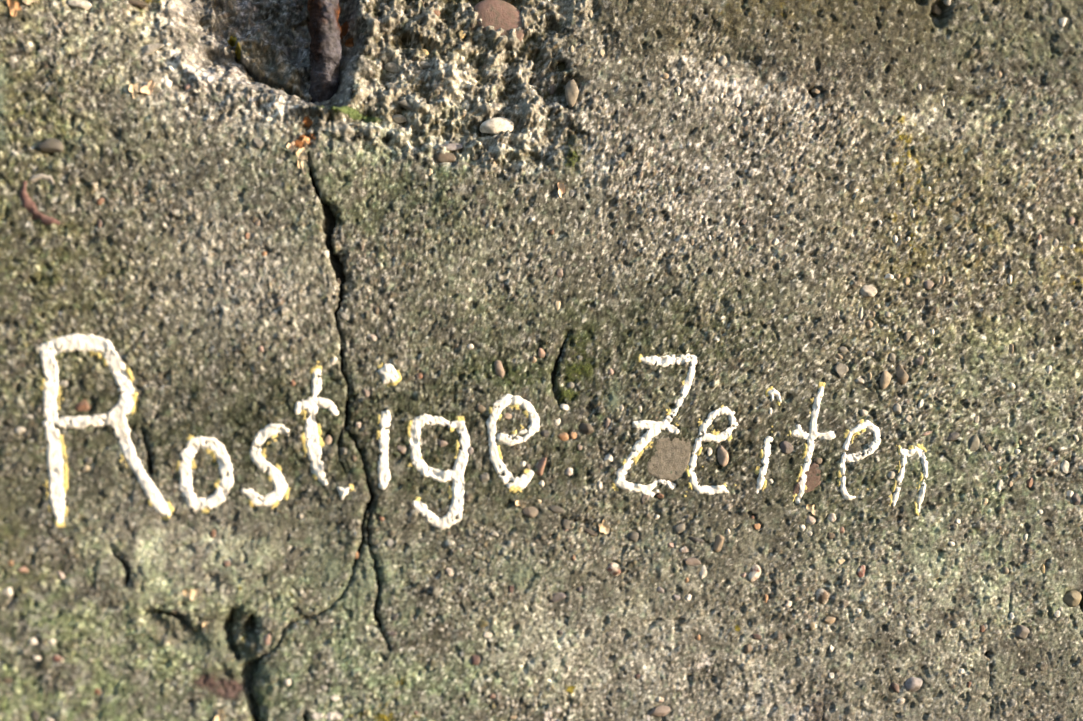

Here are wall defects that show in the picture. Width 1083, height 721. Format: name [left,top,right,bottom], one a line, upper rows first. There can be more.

rust [307,0,354,62]
peeling [129,80,155,99]
peeling [165,0,1083,181]
crack [309,163,388,645]
crack [142,429,153,474]
crack [114,552,130,585]
crack [151,610,184,618]
crack [248,648,275,679]